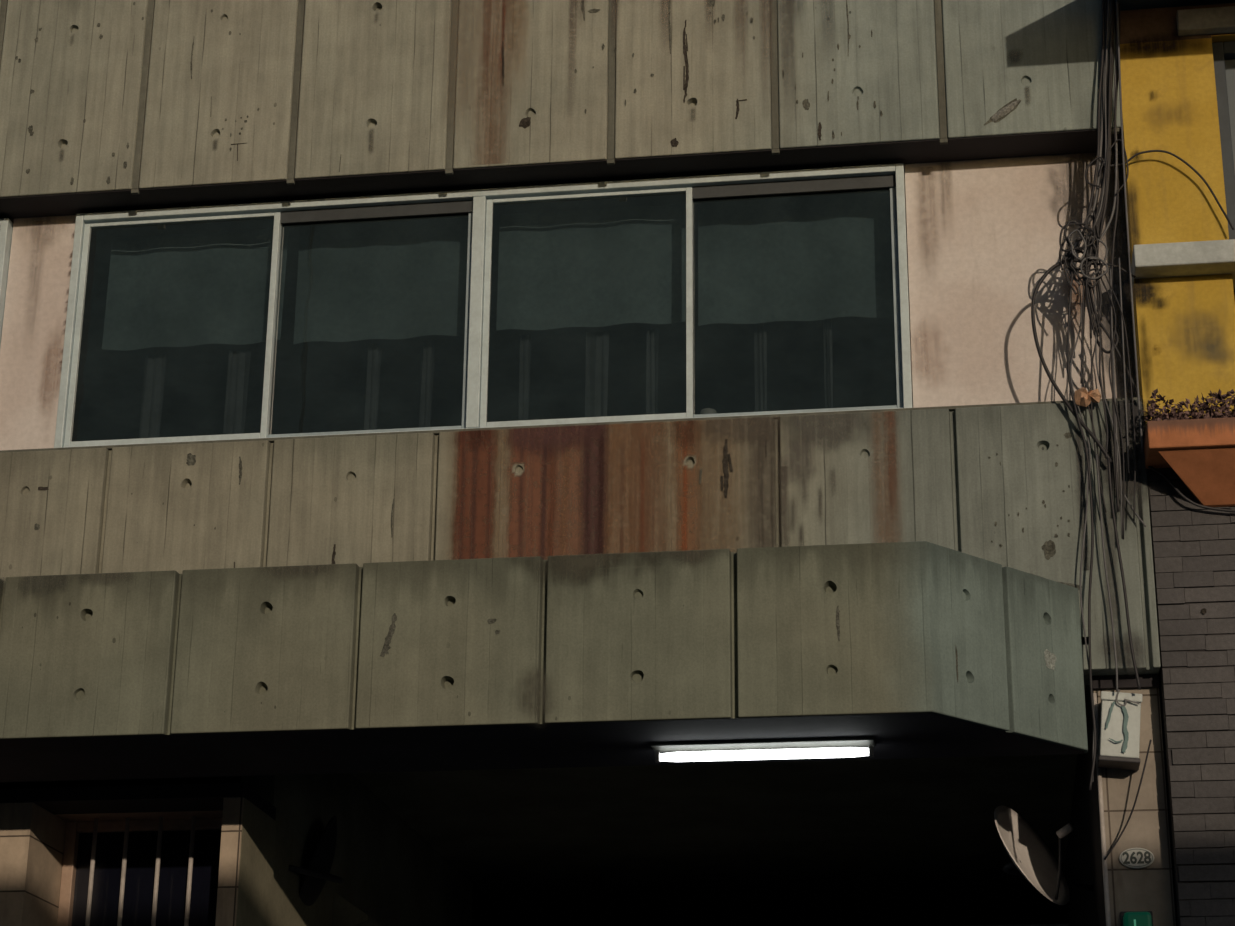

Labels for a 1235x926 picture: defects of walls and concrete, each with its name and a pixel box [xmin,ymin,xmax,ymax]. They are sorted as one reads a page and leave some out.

corrosion [453,417,769,560]